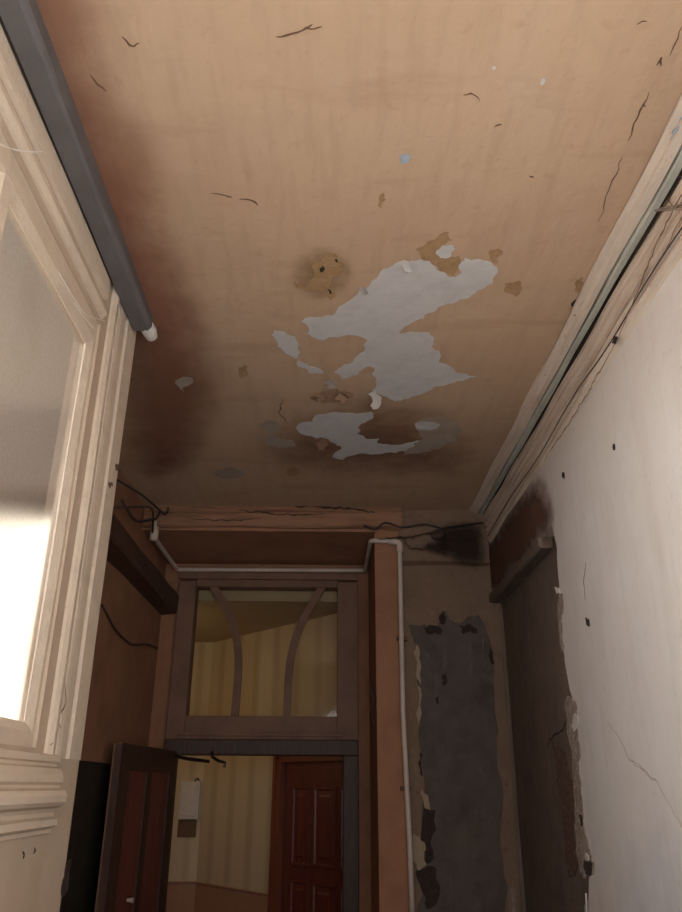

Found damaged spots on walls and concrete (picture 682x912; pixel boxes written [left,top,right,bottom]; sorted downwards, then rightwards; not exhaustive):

peeling [271,232,503,460]
flaking render [554,587,564,652]
flaking render [409,611,508,912]
flaking render [547,694,595,879]